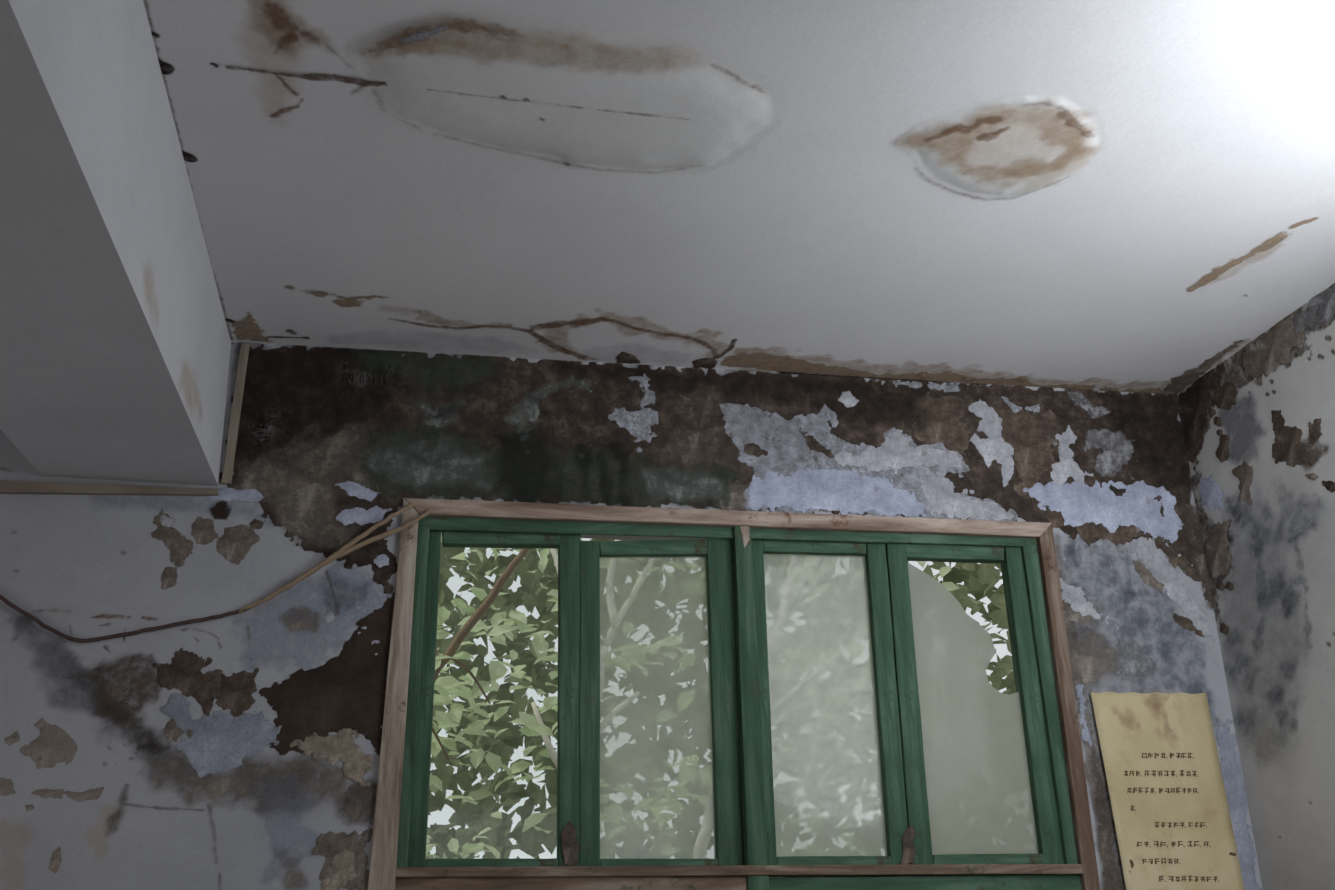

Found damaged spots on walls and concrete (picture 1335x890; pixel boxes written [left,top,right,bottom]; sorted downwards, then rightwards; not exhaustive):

peeling [1187,218,1317,292]
damp [367,428,736,509]
flaking render [88,285,1335,890]
peeling [4,718,77,769]
damp [18,618,309,811]
peeling [0,777,104,811]
peeling [49,847,62,873]